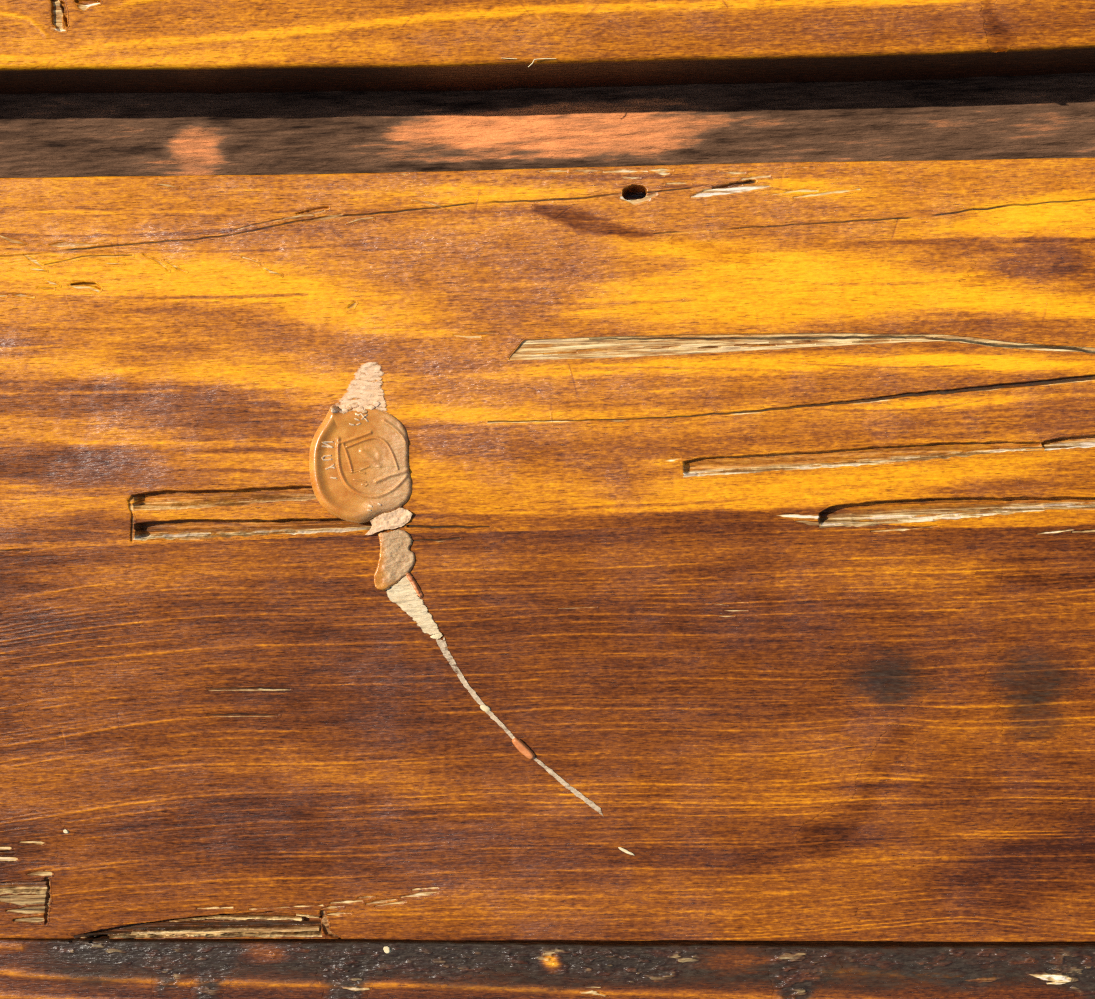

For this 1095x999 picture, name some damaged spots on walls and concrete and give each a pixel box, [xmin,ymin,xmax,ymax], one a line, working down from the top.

crack [485,372,1095,426]
peeling [512,737,535,759]
spalling [0,840,47,863]
spalling [0,870,54,927]
peeling [45,910,1095,999]